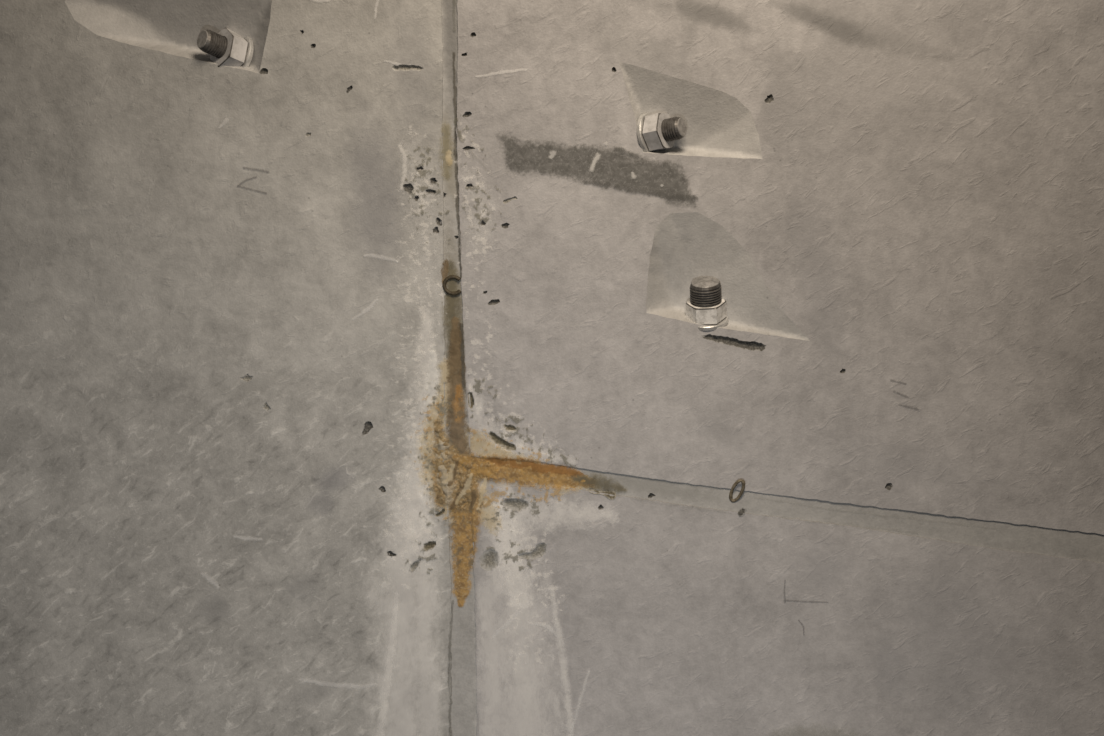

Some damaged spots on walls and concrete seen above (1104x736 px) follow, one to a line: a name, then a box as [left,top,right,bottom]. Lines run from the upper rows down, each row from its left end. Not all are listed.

rust [441,259,449,284]
damp [380,261,463,736]
rust [420,317,626,607]
damp [482,499,610,736]